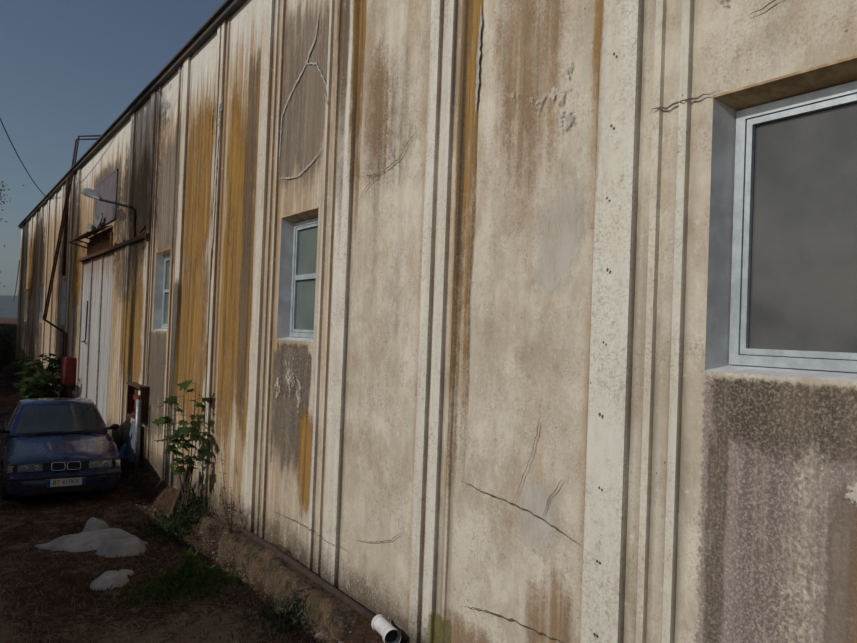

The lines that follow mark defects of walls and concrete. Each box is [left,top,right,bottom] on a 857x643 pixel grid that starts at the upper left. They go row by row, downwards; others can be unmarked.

crack [649,91,716,114]
rust [173,88,216,441]
rust [216,51,260,446]
leakage [270,342,311,472]
rust [298,411,312,514]
crack [461,411,577,543]
leakage [695,378,857,643]
crack [463,606,564,643]